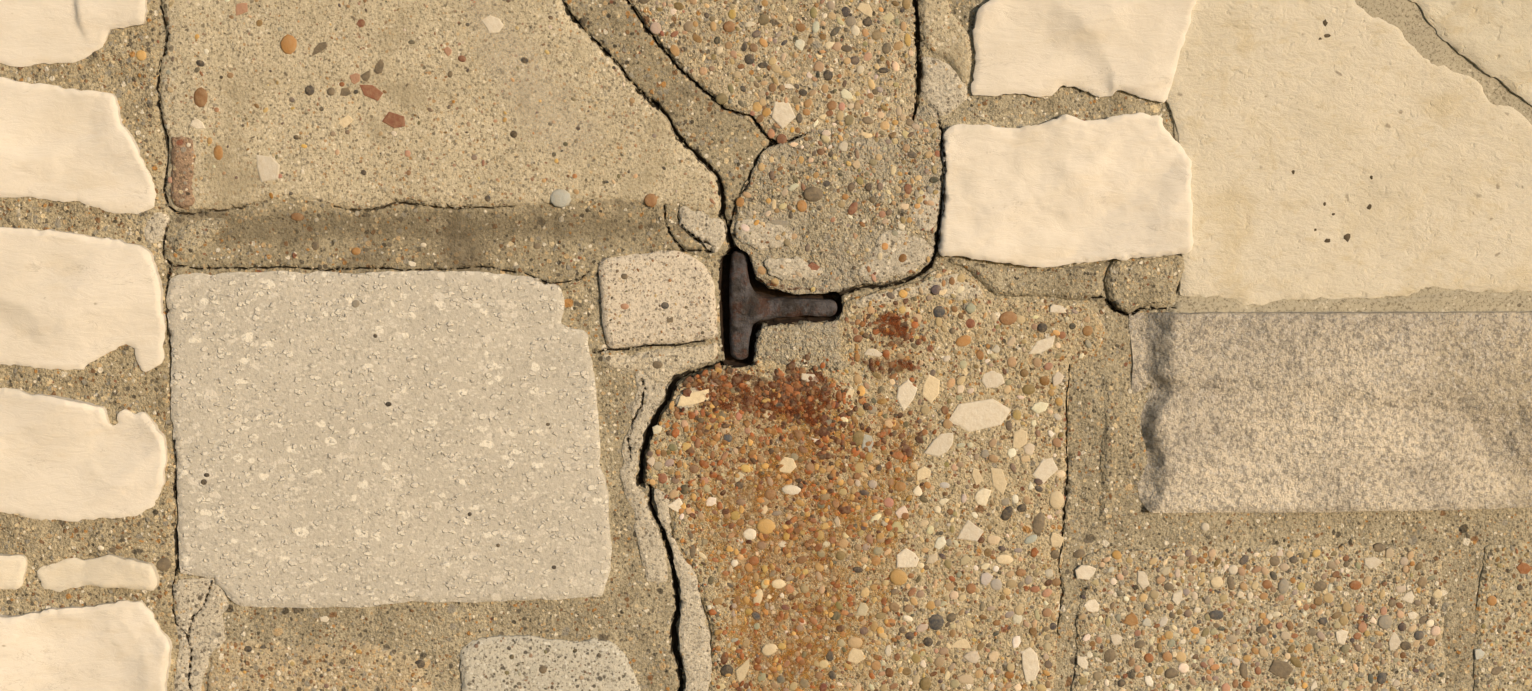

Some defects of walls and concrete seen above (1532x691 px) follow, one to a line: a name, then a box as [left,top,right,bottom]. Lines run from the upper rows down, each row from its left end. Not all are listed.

crack [563,0,808,253]
crack [833,0,947,301]
crack [593,340,724,691]
rust [654,300,937,691]